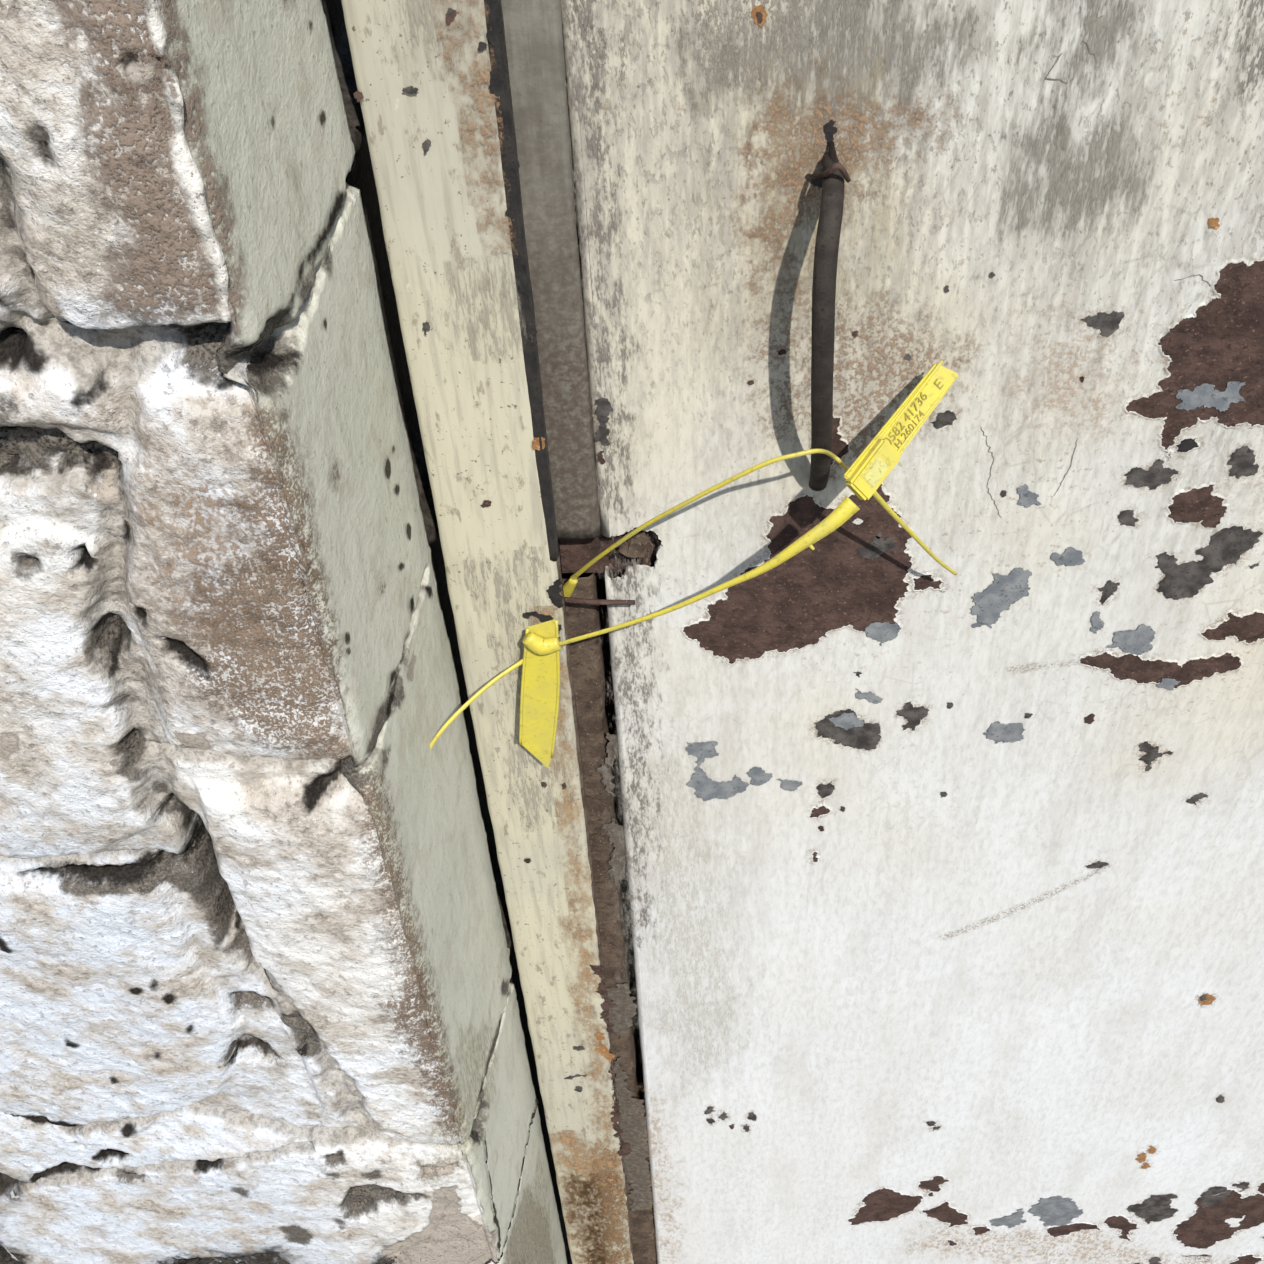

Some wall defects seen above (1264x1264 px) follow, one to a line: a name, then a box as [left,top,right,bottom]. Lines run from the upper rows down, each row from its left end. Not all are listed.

corrosion [433,0,513,248]
crack [278,163,354,316]
crack [981,427,1002,518]
peeling [1118,510,1139,526]
peeling [1122,257,1264,600]
peeling [685,741,845,832]
peeling [810,850,821,863]
peeling [1086,861,1109,869]
corrosion [562,849,607,1078]
corrosion [552,1131,630,1264]